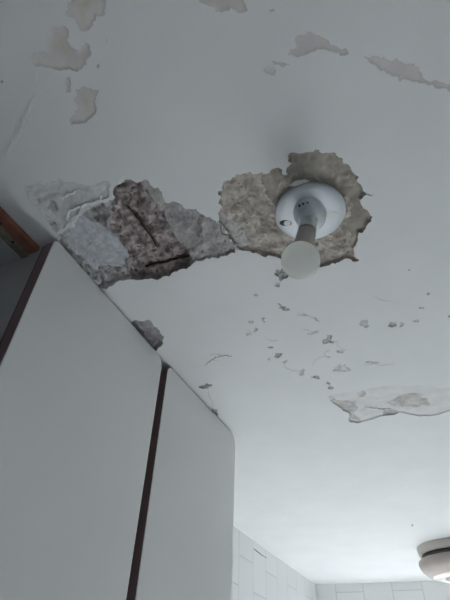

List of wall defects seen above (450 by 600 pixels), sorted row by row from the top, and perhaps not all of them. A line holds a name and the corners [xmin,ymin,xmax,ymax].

peeling [65,0,106,32]
peeling [193,0,247,13]
peeling [31,26,99,125]
peeling [263,31,349,76]
peeling [363,56,450,91]
spalling [25,149,372,289]
flaking render [131,320,164,351]
peeling [326,382,450,423]